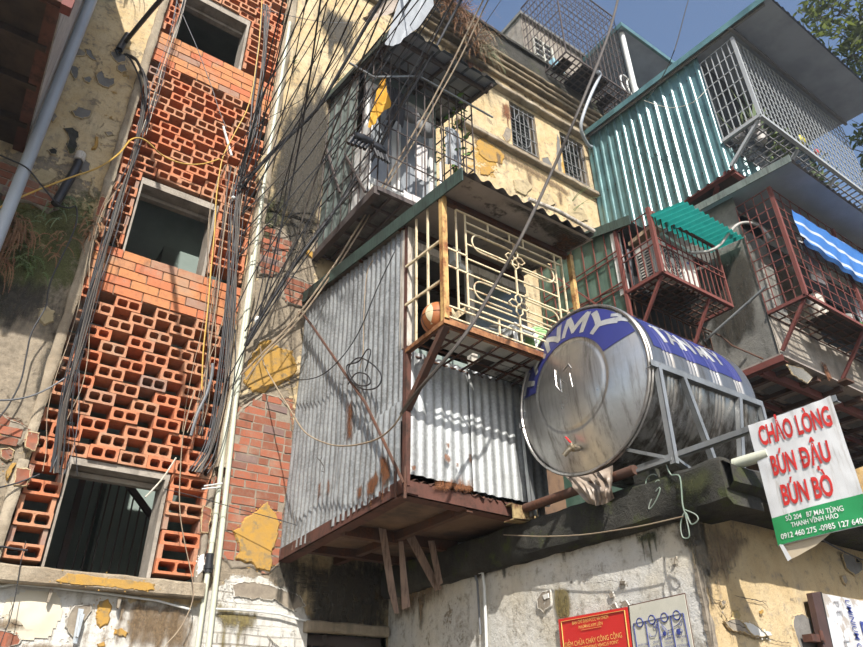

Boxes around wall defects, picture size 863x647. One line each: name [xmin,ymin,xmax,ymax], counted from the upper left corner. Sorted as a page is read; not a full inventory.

flaking render [46,103,92,156]
peeling [476,127,513,176]
flaking render [258,223,313,309]
flaking render [0,413,43,488]
flaking render [200,340,306,612]
rust [357,457,390,506]
rust [435,479,472,491]
peeling [0,630,22,647]
peeling [49,570,161,647]
water stain [218,604,256,647]
water stain [277,579,296,609]
flaking render [693,565,766,647]